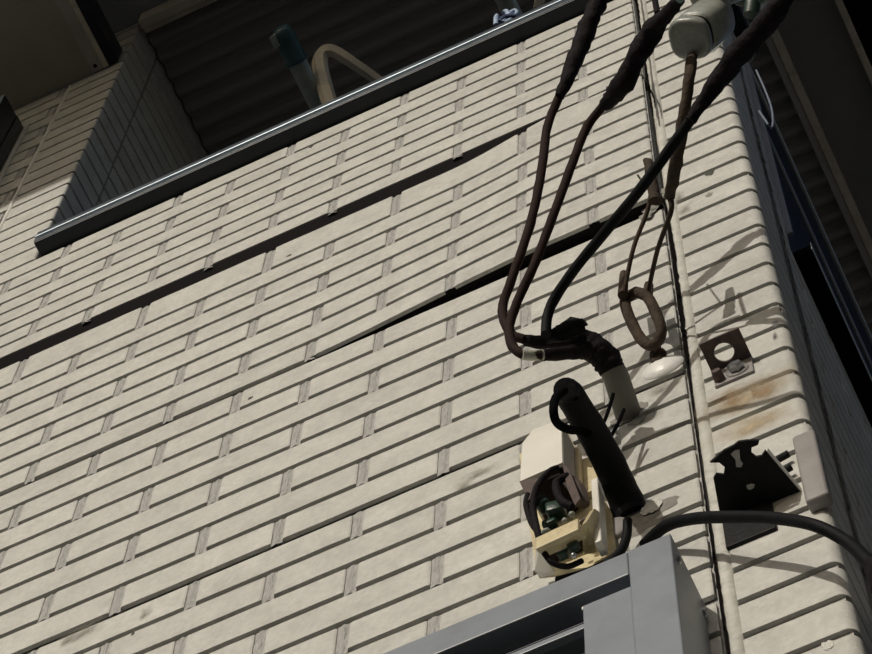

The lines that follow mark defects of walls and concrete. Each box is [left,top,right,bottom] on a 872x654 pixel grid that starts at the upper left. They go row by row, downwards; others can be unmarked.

rust [715,377,775,412]